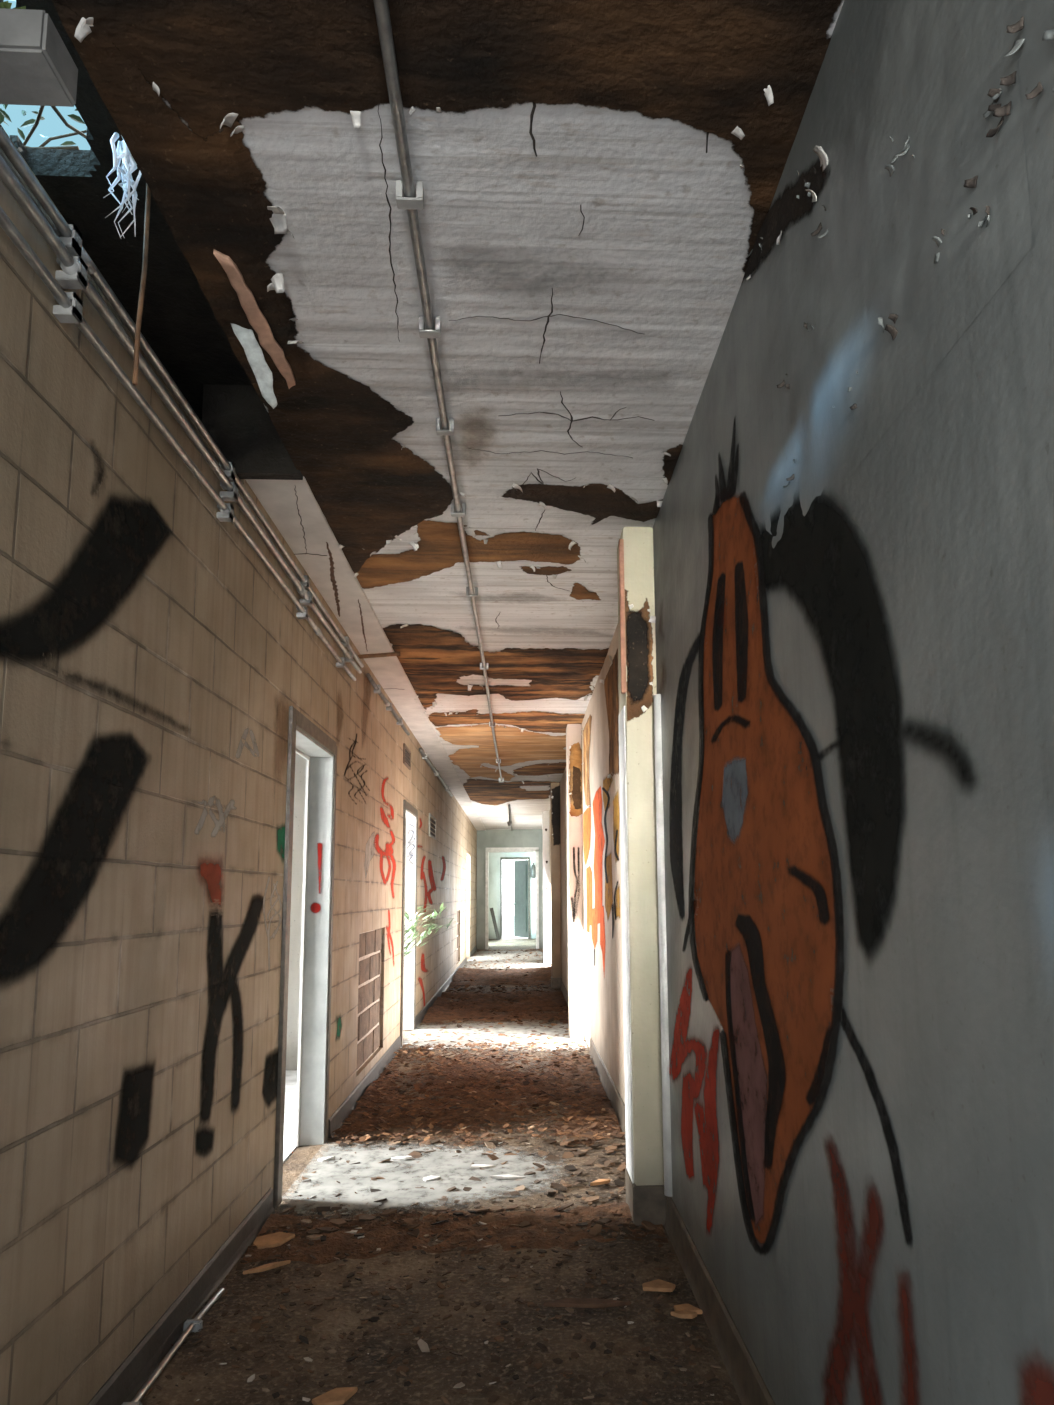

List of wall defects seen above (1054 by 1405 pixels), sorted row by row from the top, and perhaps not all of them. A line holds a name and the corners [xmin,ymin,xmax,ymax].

peeling [52,0,842,602]
peeling [383,590,656,845]